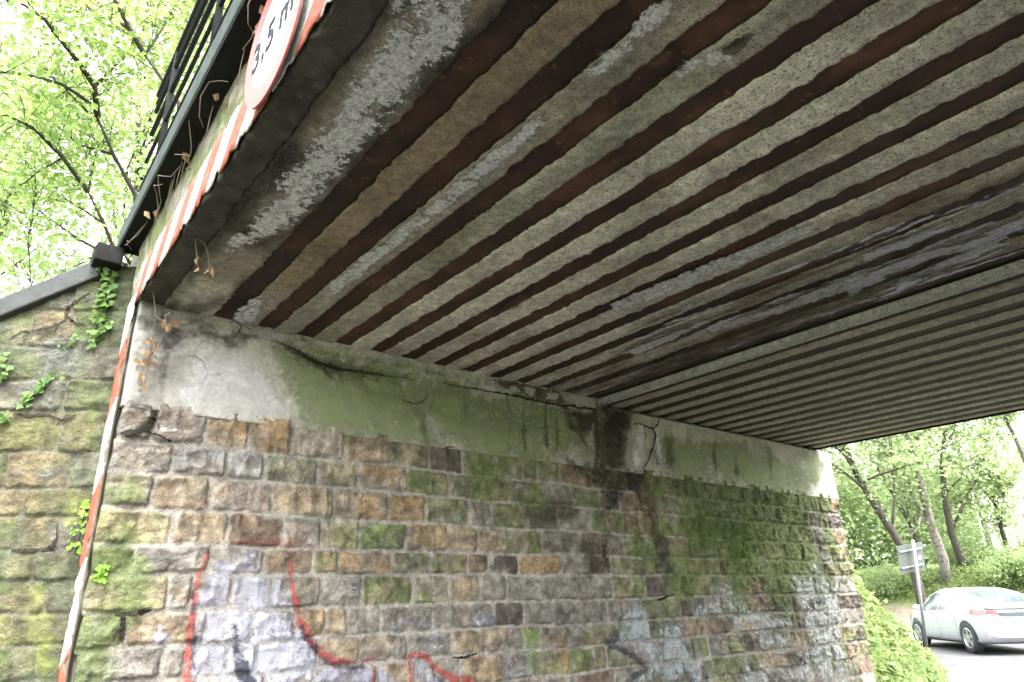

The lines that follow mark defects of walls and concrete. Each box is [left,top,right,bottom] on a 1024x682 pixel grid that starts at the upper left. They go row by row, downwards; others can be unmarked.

leakage [223,0,469,252]
leakage [321,116,546,295]
leakage [233,299,263,325]
leakage [597,182,1024,383]
crack [120,412,172,442]
crack [277,342,596,452]
leakage [562,402,661,512]
crack [633,418,660,468]
leakage [585,539,609,578]